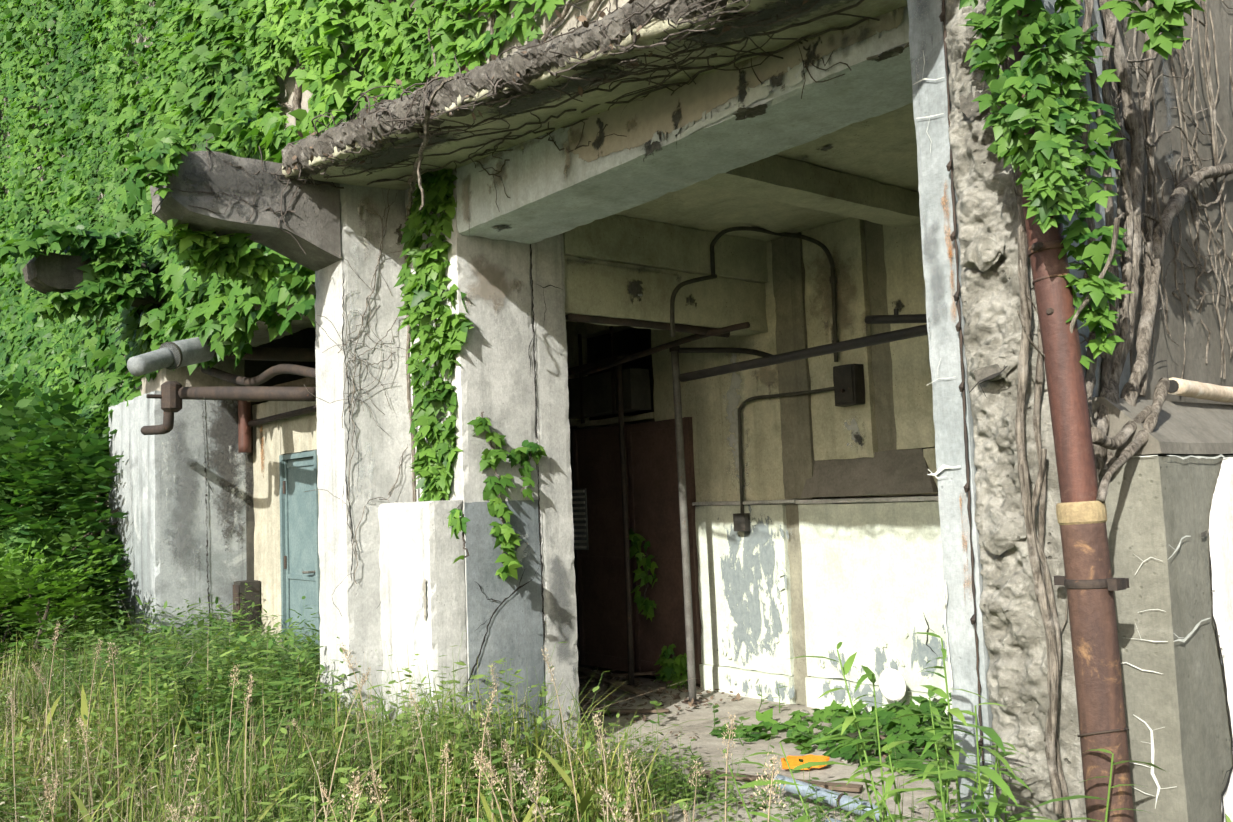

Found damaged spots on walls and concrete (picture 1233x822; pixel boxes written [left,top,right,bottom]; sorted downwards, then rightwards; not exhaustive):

peeling [568,7,910,162]
water stain [169,400,254,565]
crack [465,244,563,687]
crack [1116,452,1229,460]
peeling [714,505,794,702]
crack [1121,536,1233,822]